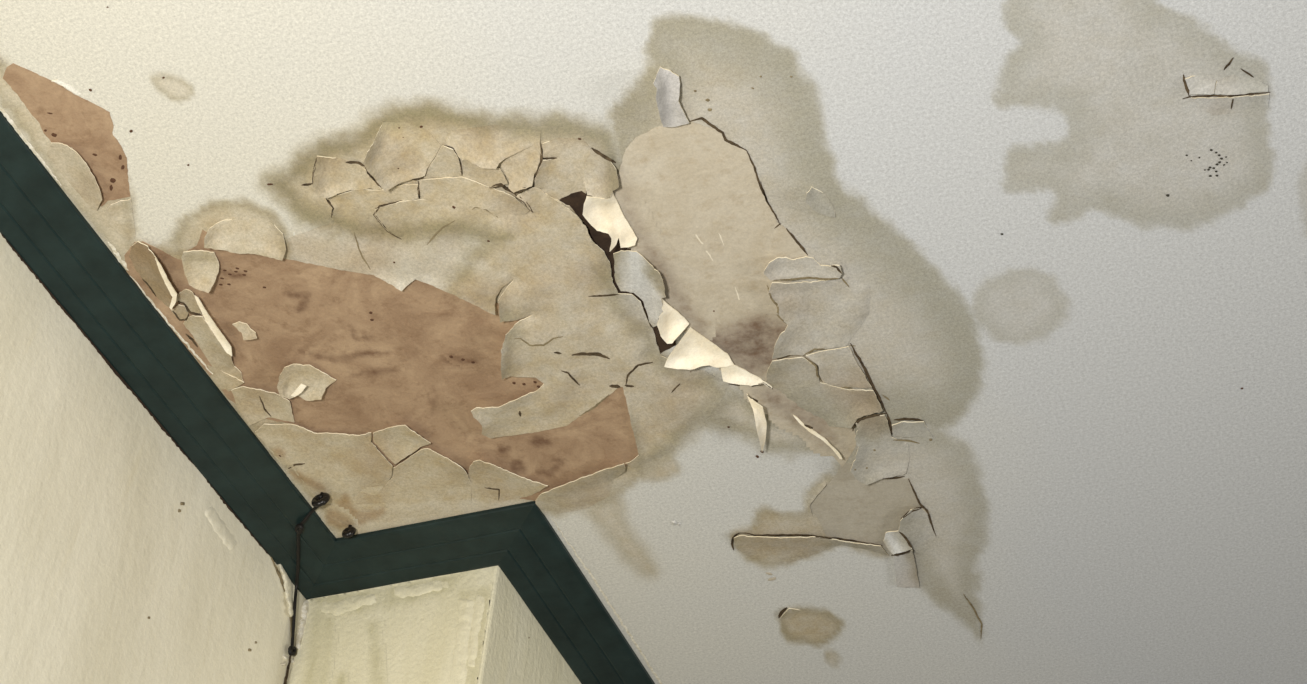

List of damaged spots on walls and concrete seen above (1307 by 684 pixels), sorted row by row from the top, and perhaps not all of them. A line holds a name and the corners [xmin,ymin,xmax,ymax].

peeling [1183,58,1270,116]
water stain [985,0,1307,287]
peeling [0,58,939,588]
water stain [0,7,1077,650]
crack [731,533,889,567]
spalling [277,564,309,666]
water stain [773,602,852,670]